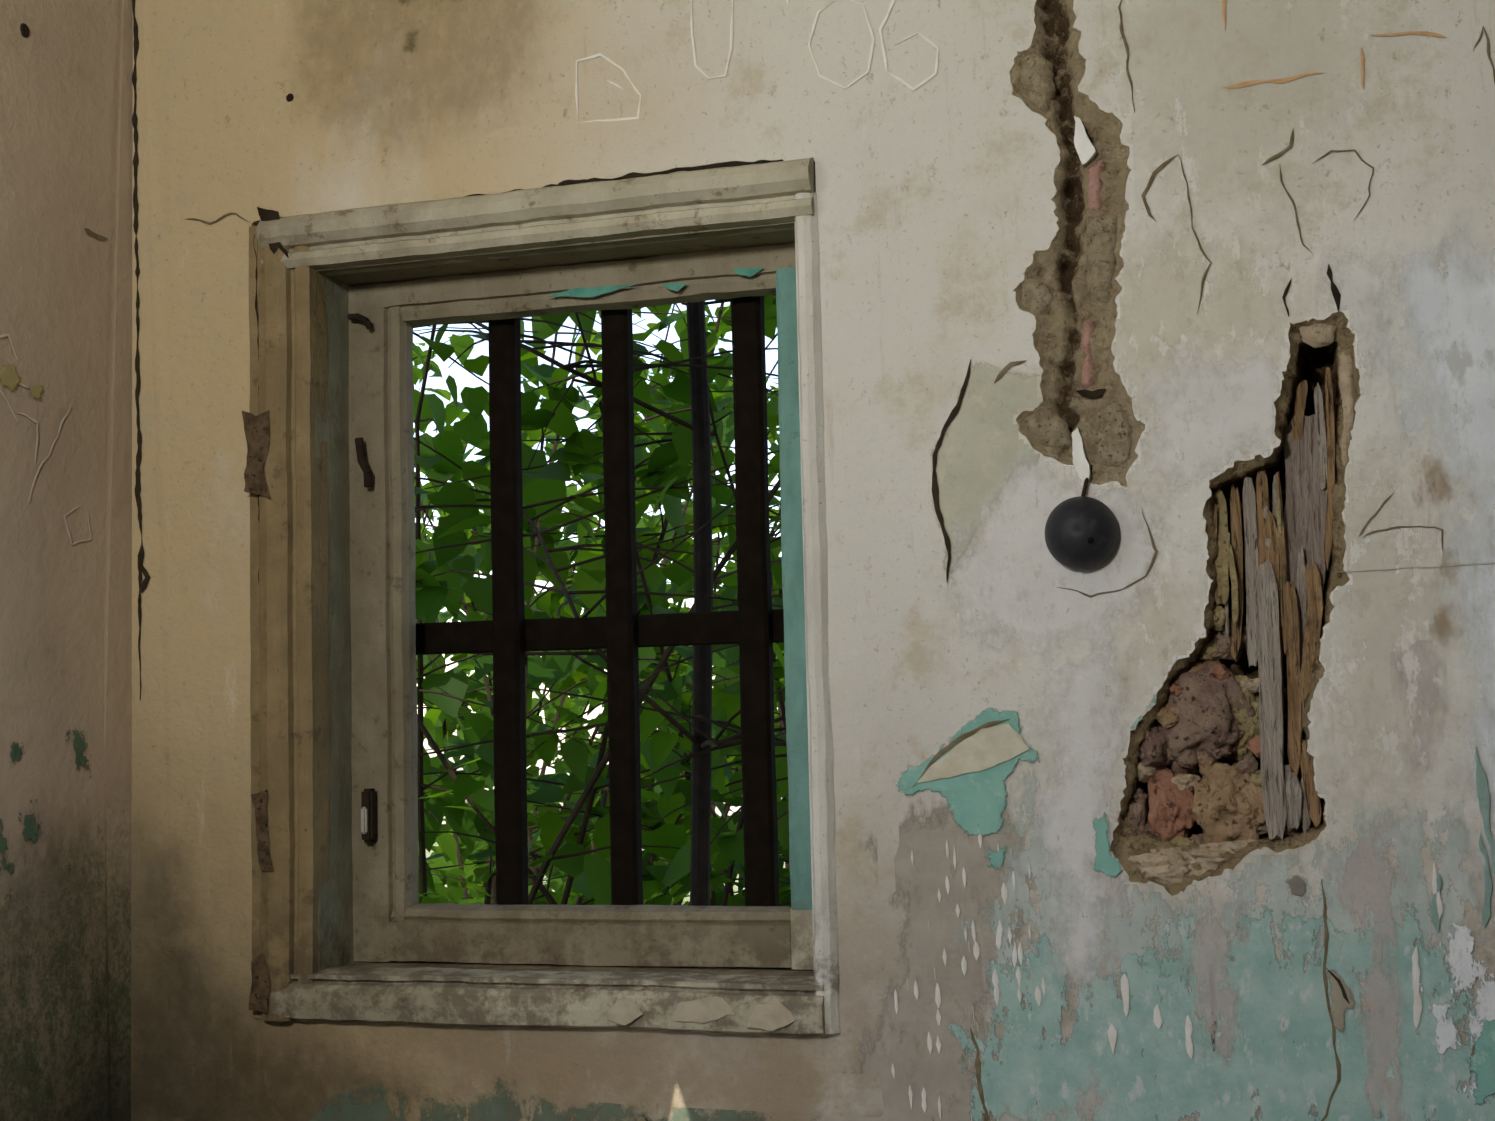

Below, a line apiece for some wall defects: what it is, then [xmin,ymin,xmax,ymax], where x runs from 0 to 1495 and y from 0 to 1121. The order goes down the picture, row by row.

crack [1262,129,1374,253]
crack [132,0,150,696]
crack [1009,0,1158,598]
peeling [10,742,22,764]
peeling [65,730,92,771]
peeling [813,264,1495,1121]
peeling [0,800,44,875]
peeling [310,1079,764,1121]